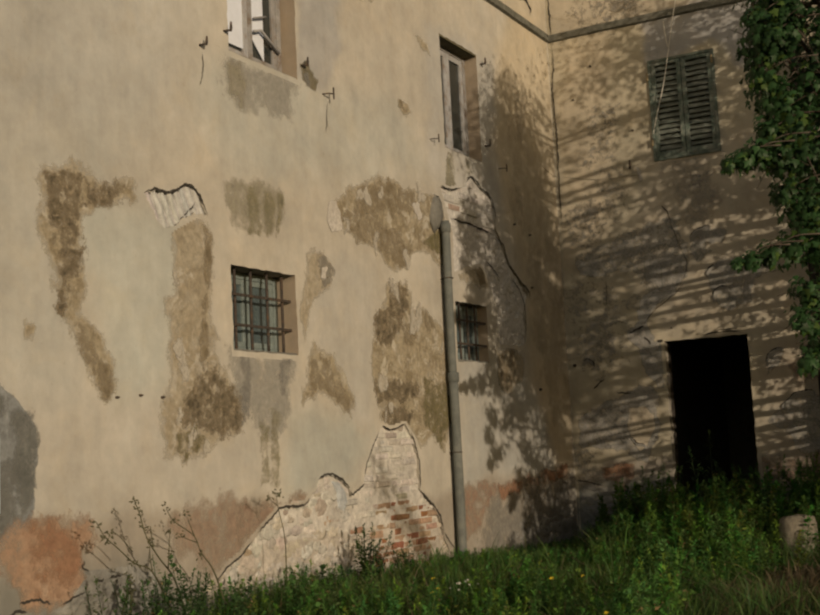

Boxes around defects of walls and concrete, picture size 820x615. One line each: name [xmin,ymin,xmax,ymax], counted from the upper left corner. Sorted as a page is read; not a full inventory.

damp [36,157,137,401]
flaking render [142,180,209,233]
damp [161,219,296,486]
damp [300,249,335,335]
damp [302,342,355,418]
damp [327,176,451,452]
flaking render [439,173,530,350]
crack [525,0,633,232]
peeling [565,103,727,463]
crack [629,206,688,344]
flaking render [18,565,162,615]
flaking render [205,421,455,602]